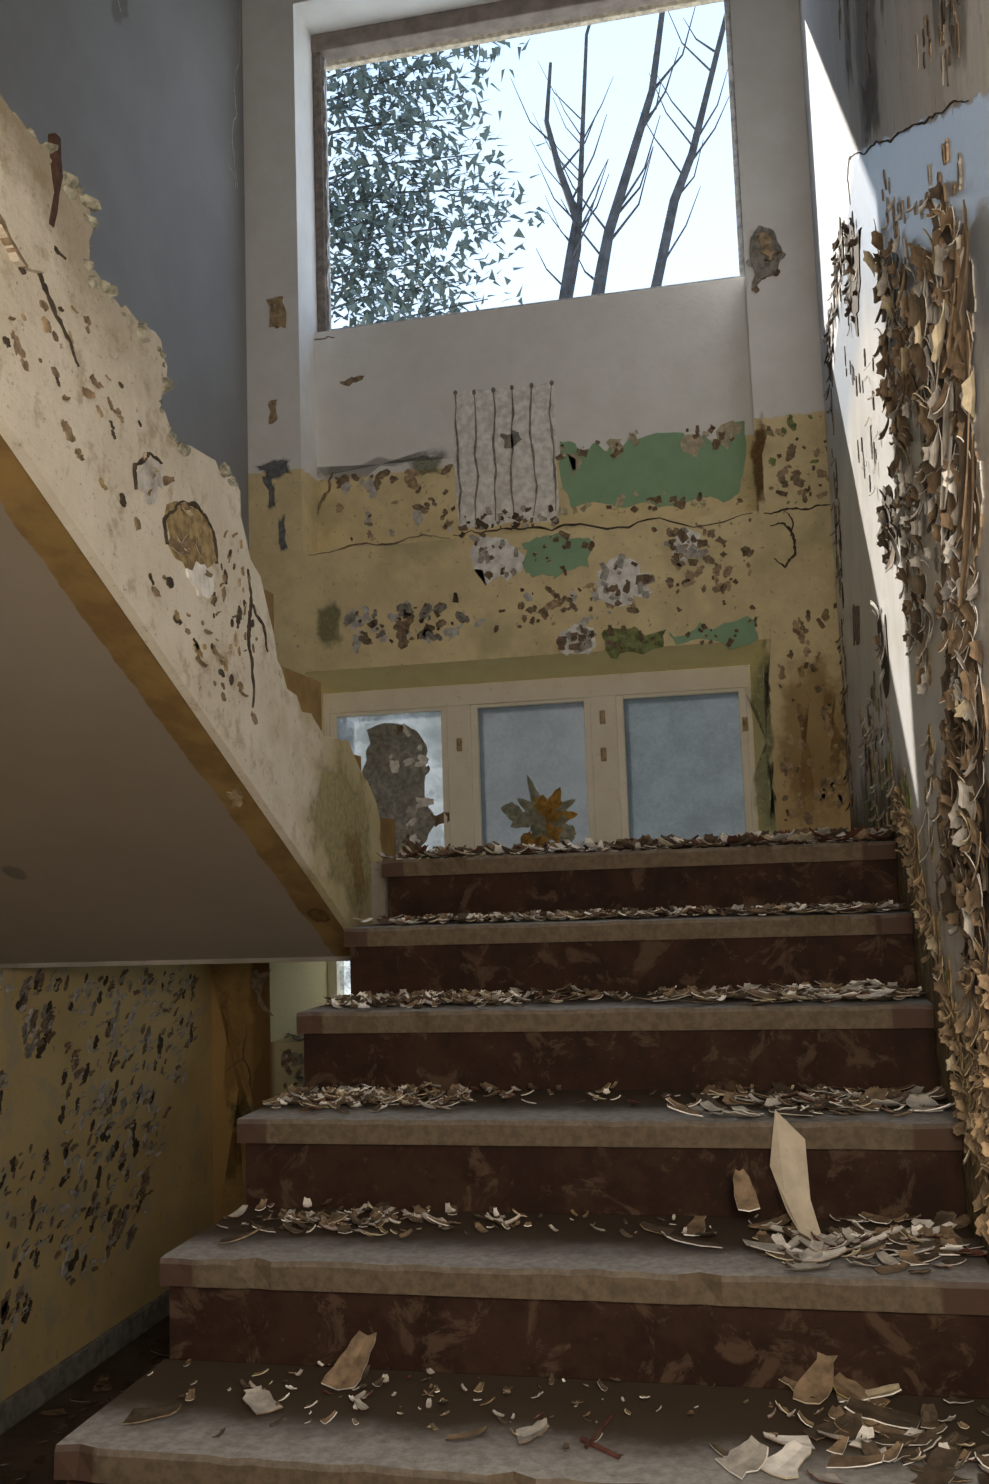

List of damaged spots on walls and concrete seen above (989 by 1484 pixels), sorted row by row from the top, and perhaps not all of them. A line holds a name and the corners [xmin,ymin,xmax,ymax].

peeling [915,0,960,87]
spalling [2,112,191,461]
spalling [268,400,278,424]
peeling [500,430,522,449]
peeling [555,430,639,461]
spalling [99,452,258,725]
peeling [335,464,754,656]
peeling [667,138,989,1244]
peeling [0,964,201,1352]
peeling [743,1225,828,1264]
peeling [122,1403,182,1425]